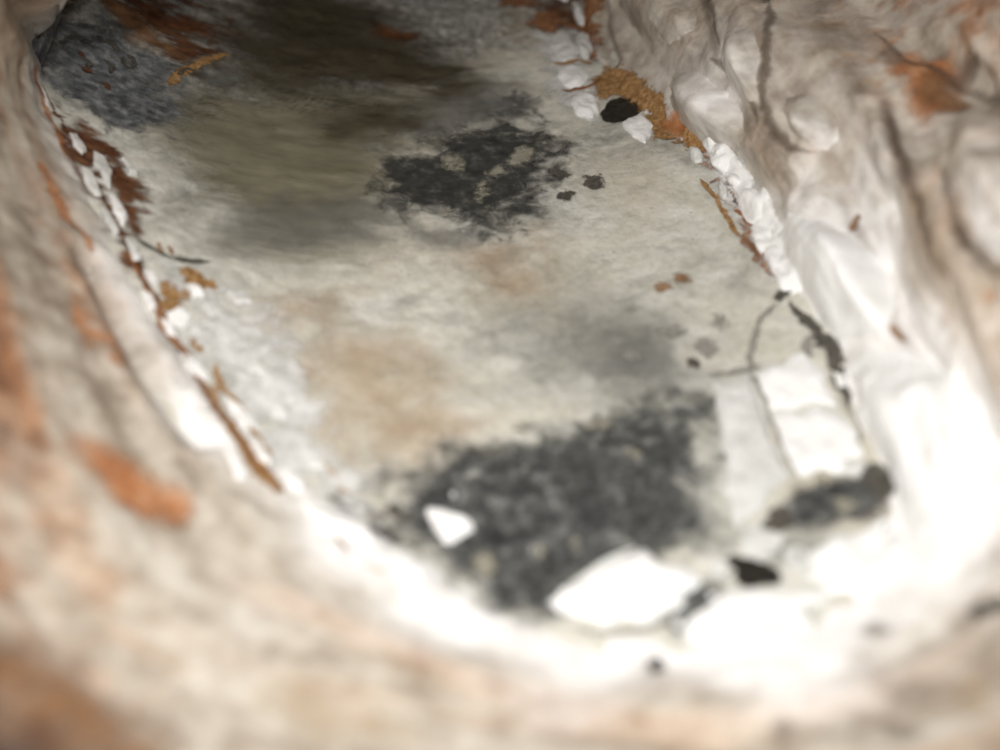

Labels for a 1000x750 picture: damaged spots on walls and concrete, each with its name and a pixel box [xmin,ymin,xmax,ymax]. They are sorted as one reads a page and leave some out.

rust [102,0,231,85]
rust [34,53,78,169]
water stain [32,0,572,251]
peeling [622,112,653,143]
rust [38,161,93,251]
water stain [99,188,329,520]
crack [707,290,862,475]
water stain [374,387,726,617]
water stain [761,462,896,534]